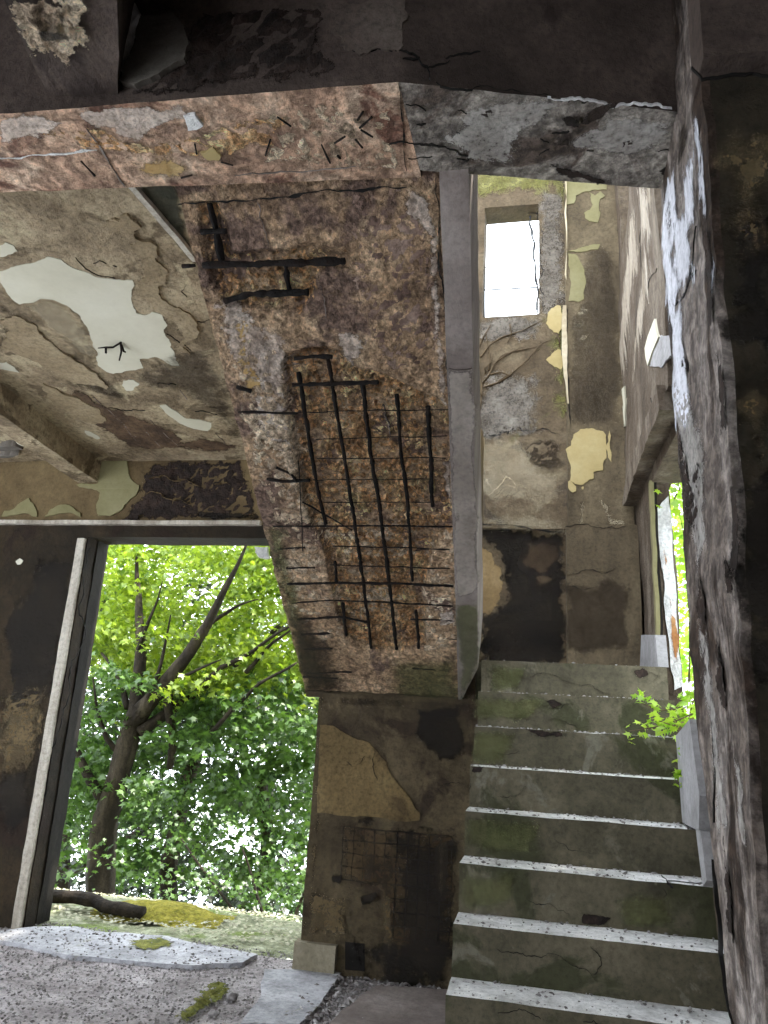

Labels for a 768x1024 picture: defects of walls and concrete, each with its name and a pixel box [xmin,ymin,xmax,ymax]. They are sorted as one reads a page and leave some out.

spalling [9,0,90,65]
spalling [0,192,457,652]
crack [178,48,672,310]
water stain [405,193,628,663]
flaking render [524,428,612,493]
flaking render [546,164,607,404]
water stain [619,119,706,560]
flaking render [316,725,420,832]
water stain [701,636,745,843]
crack [499,946,602,980]